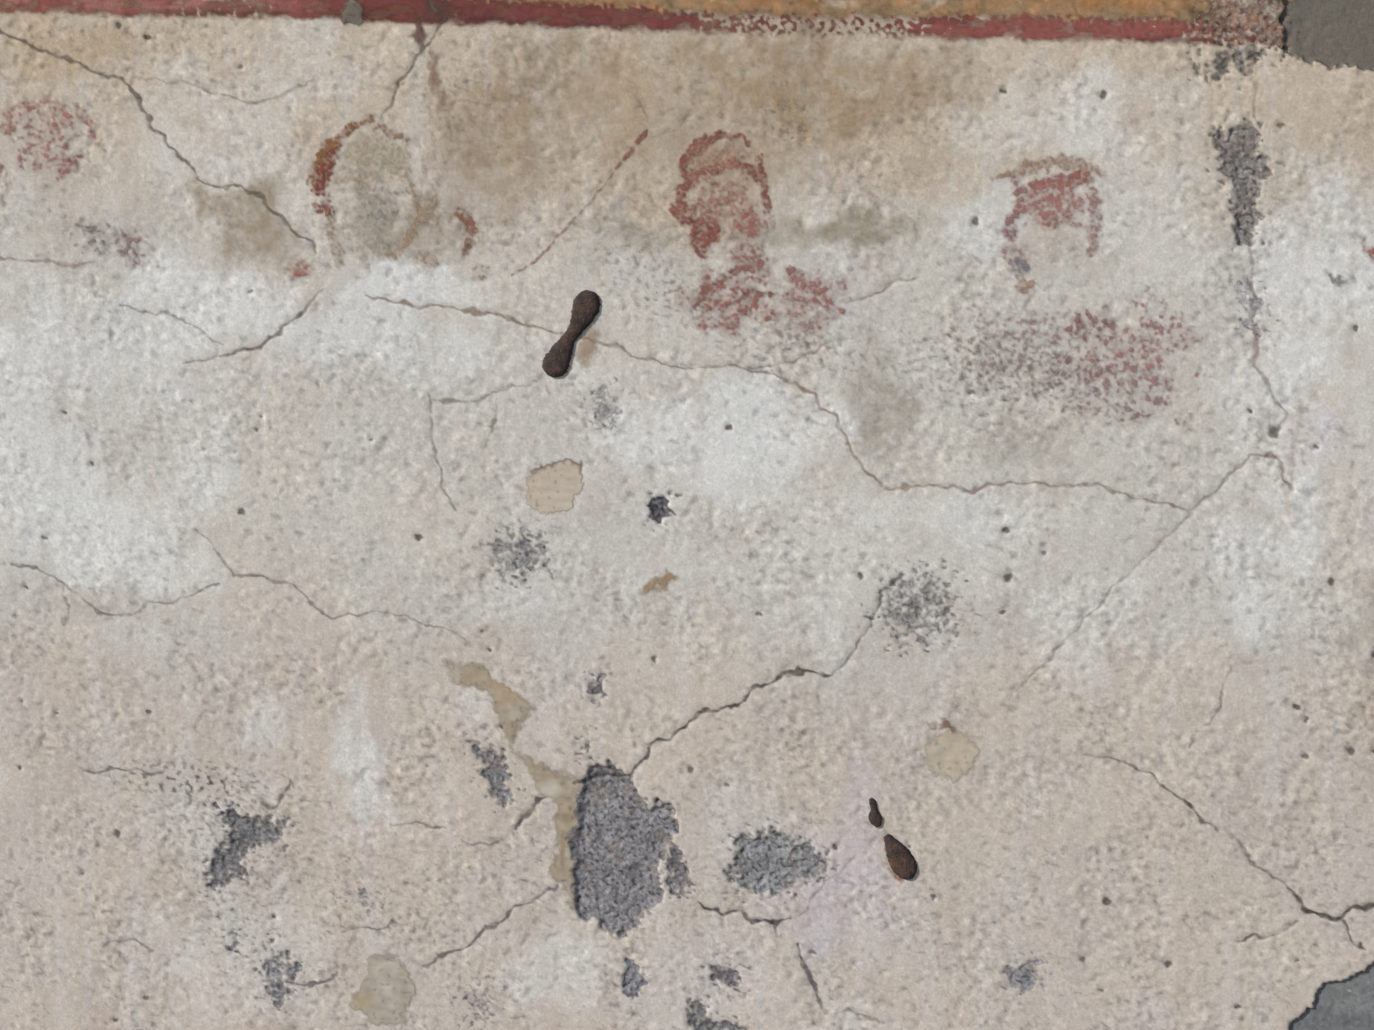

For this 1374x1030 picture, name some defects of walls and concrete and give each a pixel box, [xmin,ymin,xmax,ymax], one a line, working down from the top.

spalling [1187,0,1300,82]
crack [0,30,315,250]
spalling [1207,118,1283,246]
crack [368,296,684,369]
crack [729,352,1051,494]
spalling [467,741,520,807]
crack [578,667,830,782]
spalling [203,802,294,892]
spalling [567,737,694,937]
crack [699,902,856,1014]
spalling [723,824,837,903]
crack [1288,888,1374,949]